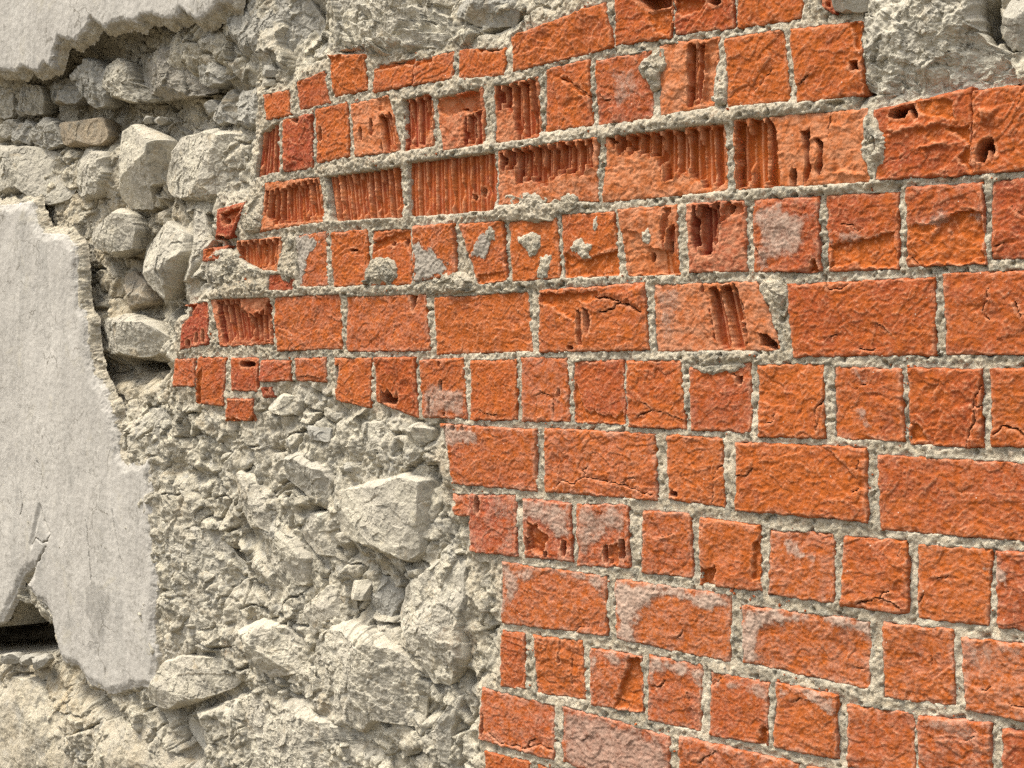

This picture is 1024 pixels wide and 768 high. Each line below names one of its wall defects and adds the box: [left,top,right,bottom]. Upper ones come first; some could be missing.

peeling [0,0,246,82]
spalling [202,0,996,425]
spalling [180,297,277,422]
spalling [907,367,986,449]
spalling [440,423,632,568]
spalling [698,517,763,591]
peeling [91,715,195,768]
spalling [589,647,646,713]
spalling [709,671,771,746]